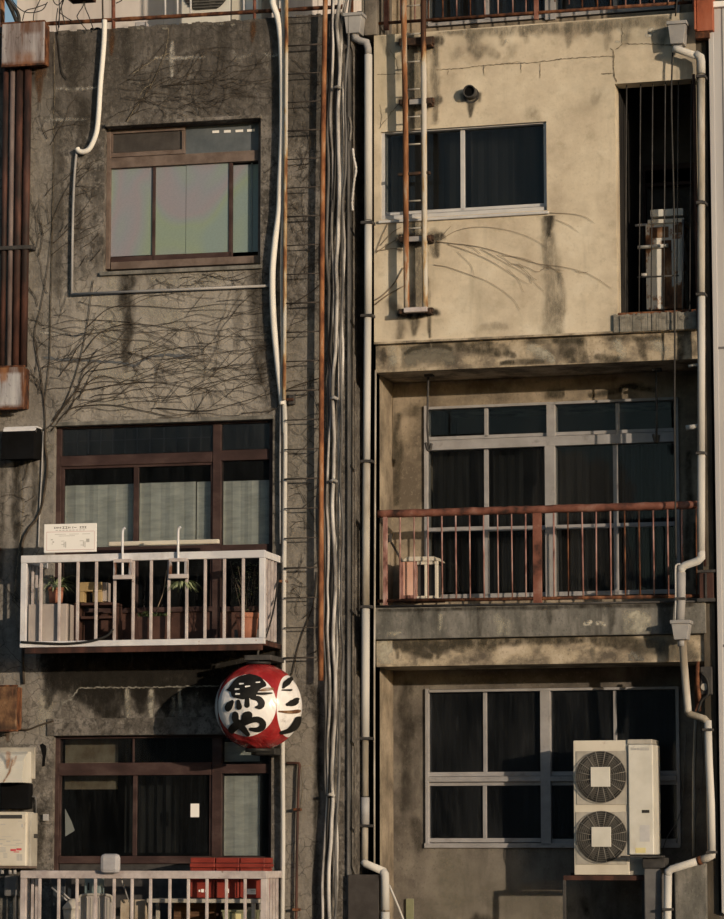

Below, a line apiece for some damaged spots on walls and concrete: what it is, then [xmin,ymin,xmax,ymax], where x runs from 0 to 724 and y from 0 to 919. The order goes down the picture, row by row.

crack [437,23,672,82]
leakage [545,215,553,255]
leakage [120,275,135,368]
leakage [403,342,544,366]
leakage [553,332,620,363]
leakage [392,636,694,659]